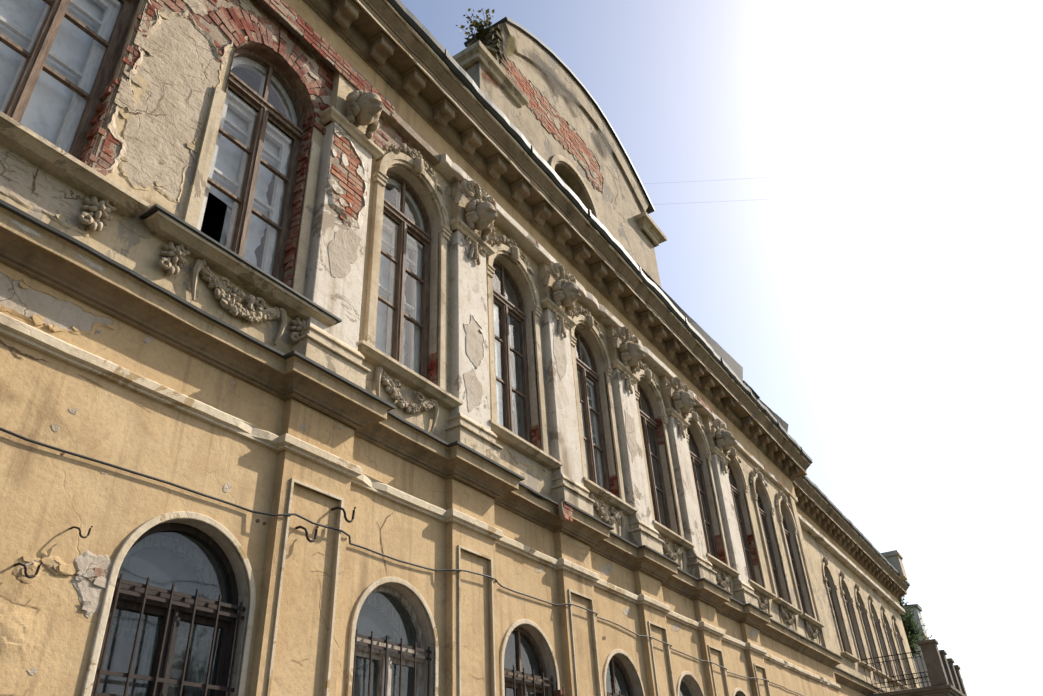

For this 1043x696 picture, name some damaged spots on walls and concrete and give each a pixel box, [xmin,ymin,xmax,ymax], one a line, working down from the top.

crack [0,160,39,193]
flaking render [0,144,90,237]
flaking render [80,0,434,287]
flaking render [469,24,604,194]
flaking render [0,269,116,335]
peeling [463,314,485,412]
crack [0,595,41,615]
spalling [12,550,113,618]